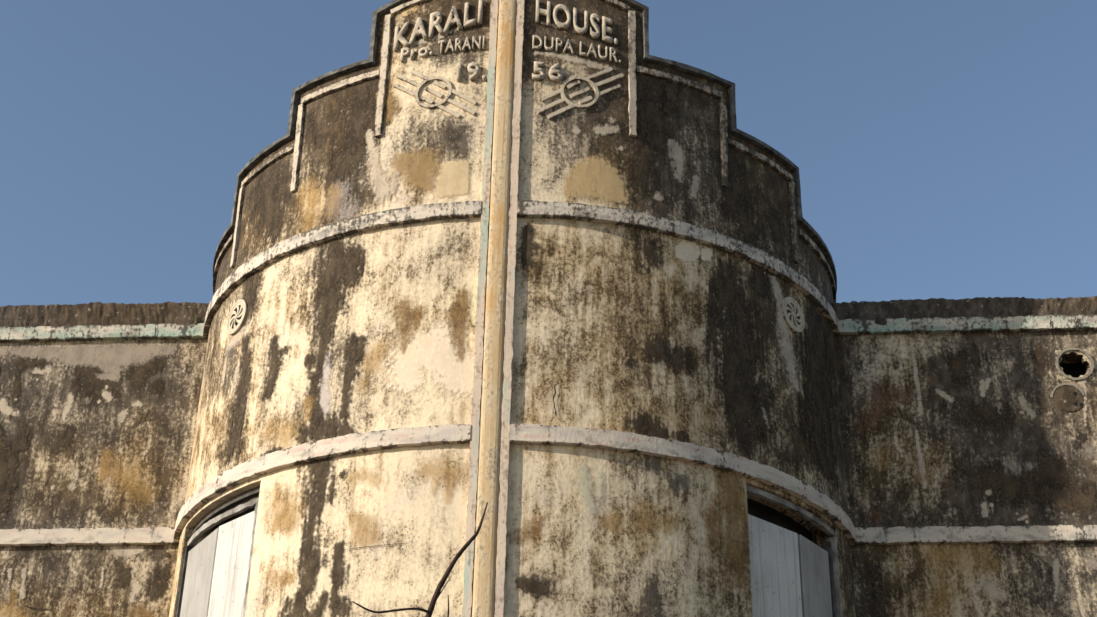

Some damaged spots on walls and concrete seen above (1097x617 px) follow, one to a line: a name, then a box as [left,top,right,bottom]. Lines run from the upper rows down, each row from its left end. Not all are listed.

damp [325,65,389,221]
damp [628,57,701,201]
damp [248,150,292,246]
damp [519,223,538,270]
damp [635,239,663,271]
damp [8,346,52,404]
damp [304,236,366,425]
damp [625,334,693,374]
damp [706,258,839,486]
damp [909,341,1015,436]
damp [278,458,351,617]
peeling [981,490,994,518]